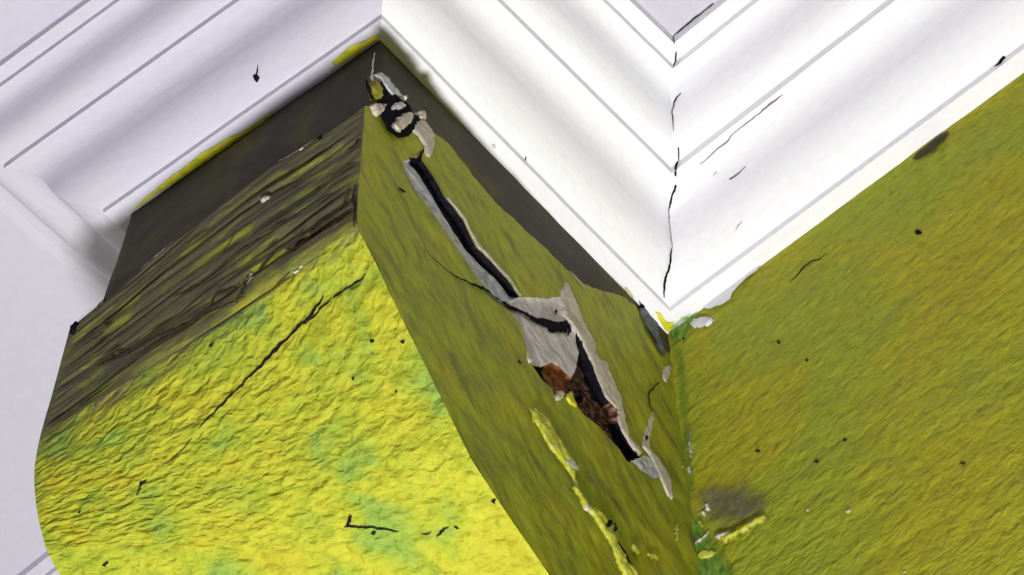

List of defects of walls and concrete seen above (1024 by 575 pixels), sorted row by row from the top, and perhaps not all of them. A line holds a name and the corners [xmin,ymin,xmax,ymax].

spalling [365,53,435,158]
leakage [913,131,949,160]
crack [663,93,783,298]
crack [789,253,828,283]
crack [136,274,366,496]
spalling [502,271,660,478]
peeling [662,365,672,382]
peeling [529,408,638,575]
leakage [701,492,759,516]
crack [344,516,397,535]
crack [422,526,458,537]